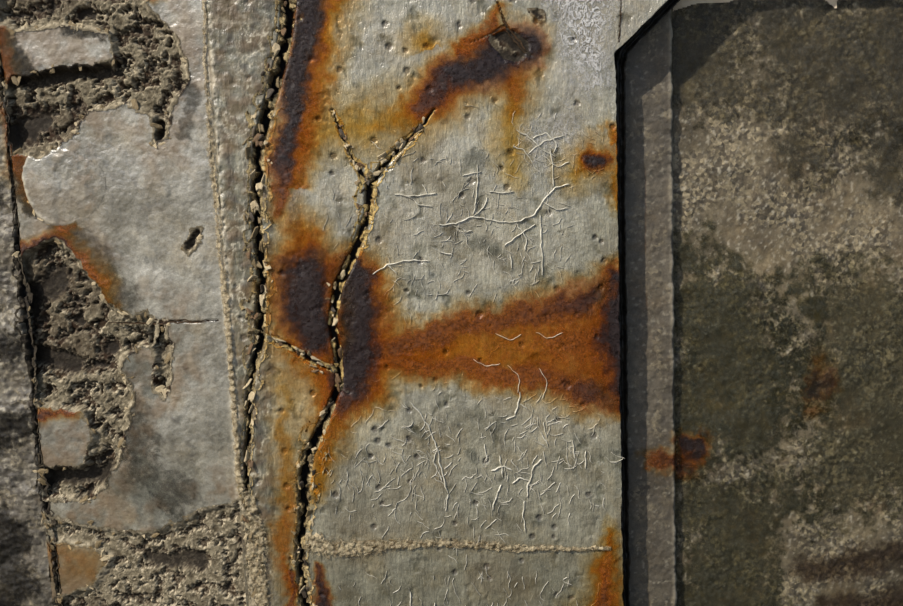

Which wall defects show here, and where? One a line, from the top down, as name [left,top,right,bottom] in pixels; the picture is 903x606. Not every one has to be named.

spalling [0,0,190,159]
spalling [12,232,257,606]
crack [109,318,219,326]
spalling [180,226,204,256]
corrosion [270,0,327,215]
crack [238,0,623,606]
corrosion [280,233,621,416]
corrosion [410,5,542,117]
corrosion [584,154,606,168]
water stain [672,0,903,203]
water stain [674,222,903,606]
corrosion [315,563,330,606]